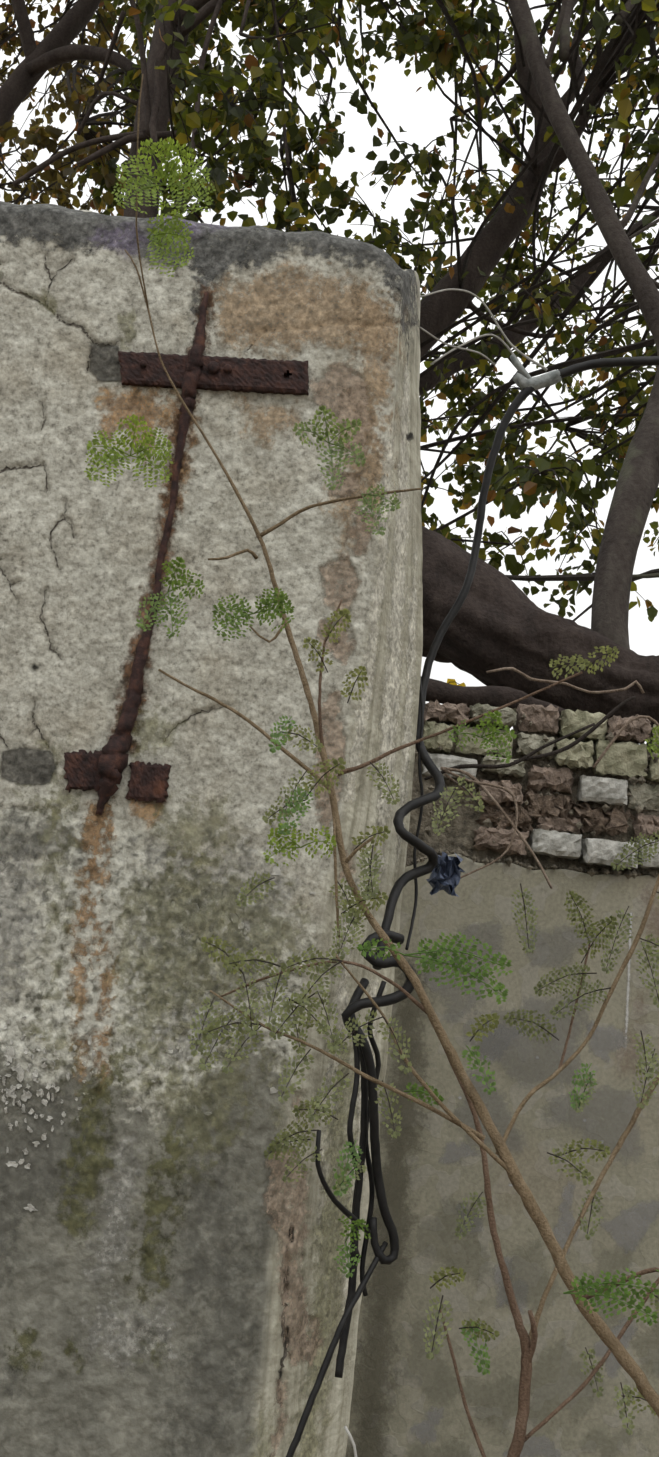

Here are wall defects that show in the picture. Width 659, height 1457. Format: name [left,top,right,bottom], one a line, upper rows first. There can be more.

crack [0,255,118,371]
crack [0,402,74,660]
rust [94,386,198,754]
crack [0,701,50,750]